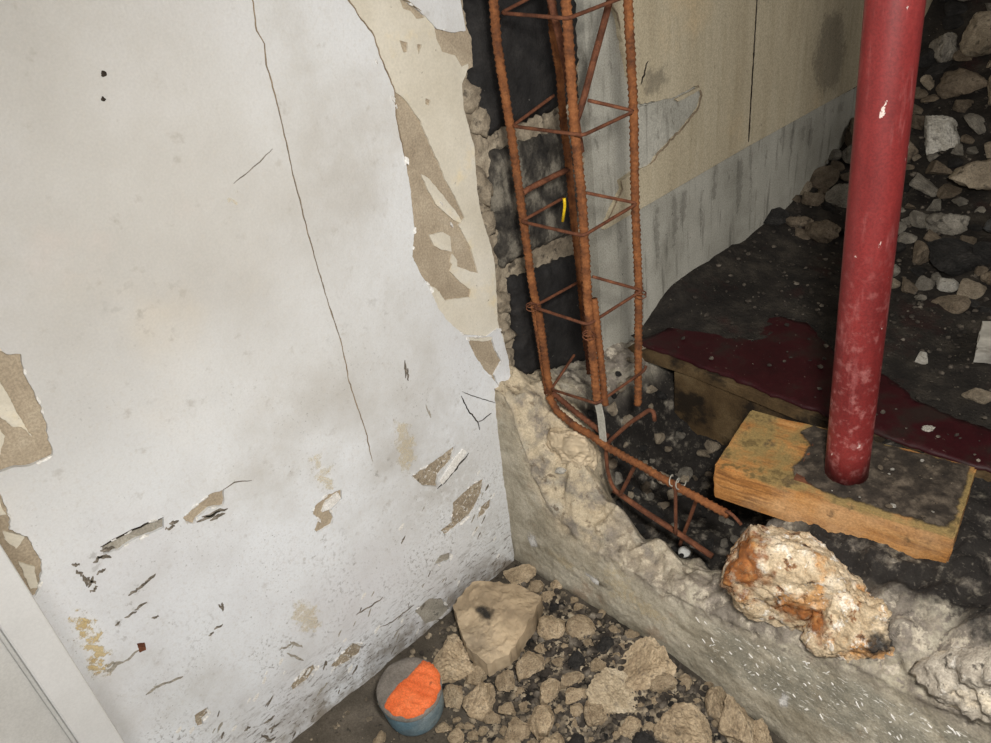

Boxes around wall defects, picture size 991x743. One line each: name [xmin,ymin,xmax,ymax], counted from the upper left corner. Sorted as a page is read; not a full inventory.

crack [252,0,373,461]
peeling [348,0,504,381]
spalling [488,0,743,567]
spalling [0,348,52,469]
spalling [0,495,43,595]
spalling [93,480,252,563]
spalling [313,490,341,531]
rust [722,531,775,598]
spalling [279,631,363,696]
spalling [391,597,449,654]
rust [773,598,824,634]
spalling [908,646,991,723]